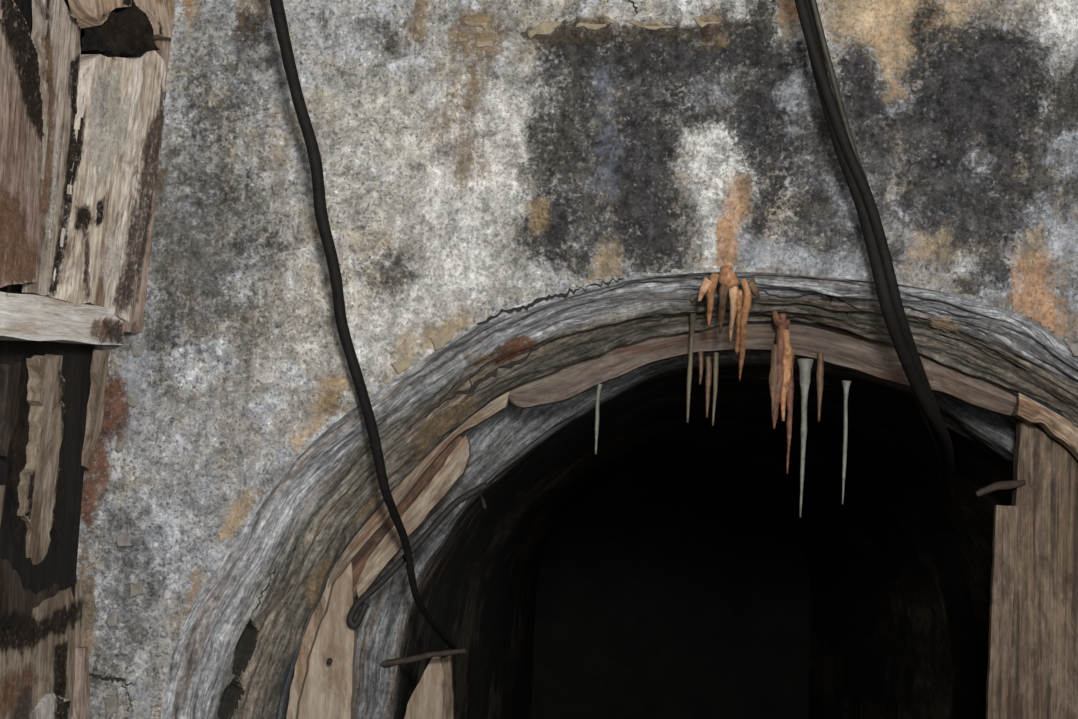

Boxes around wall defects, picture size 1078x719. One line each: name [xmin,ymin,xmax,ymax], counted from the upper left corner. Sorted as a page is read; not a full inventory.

leakage [316,0,872,382]
corrosion [714,174,751,267]
leakage [827,0,1078,298]
corrosion [1011,225,1067,336]
corrosion [81,360,129,530]